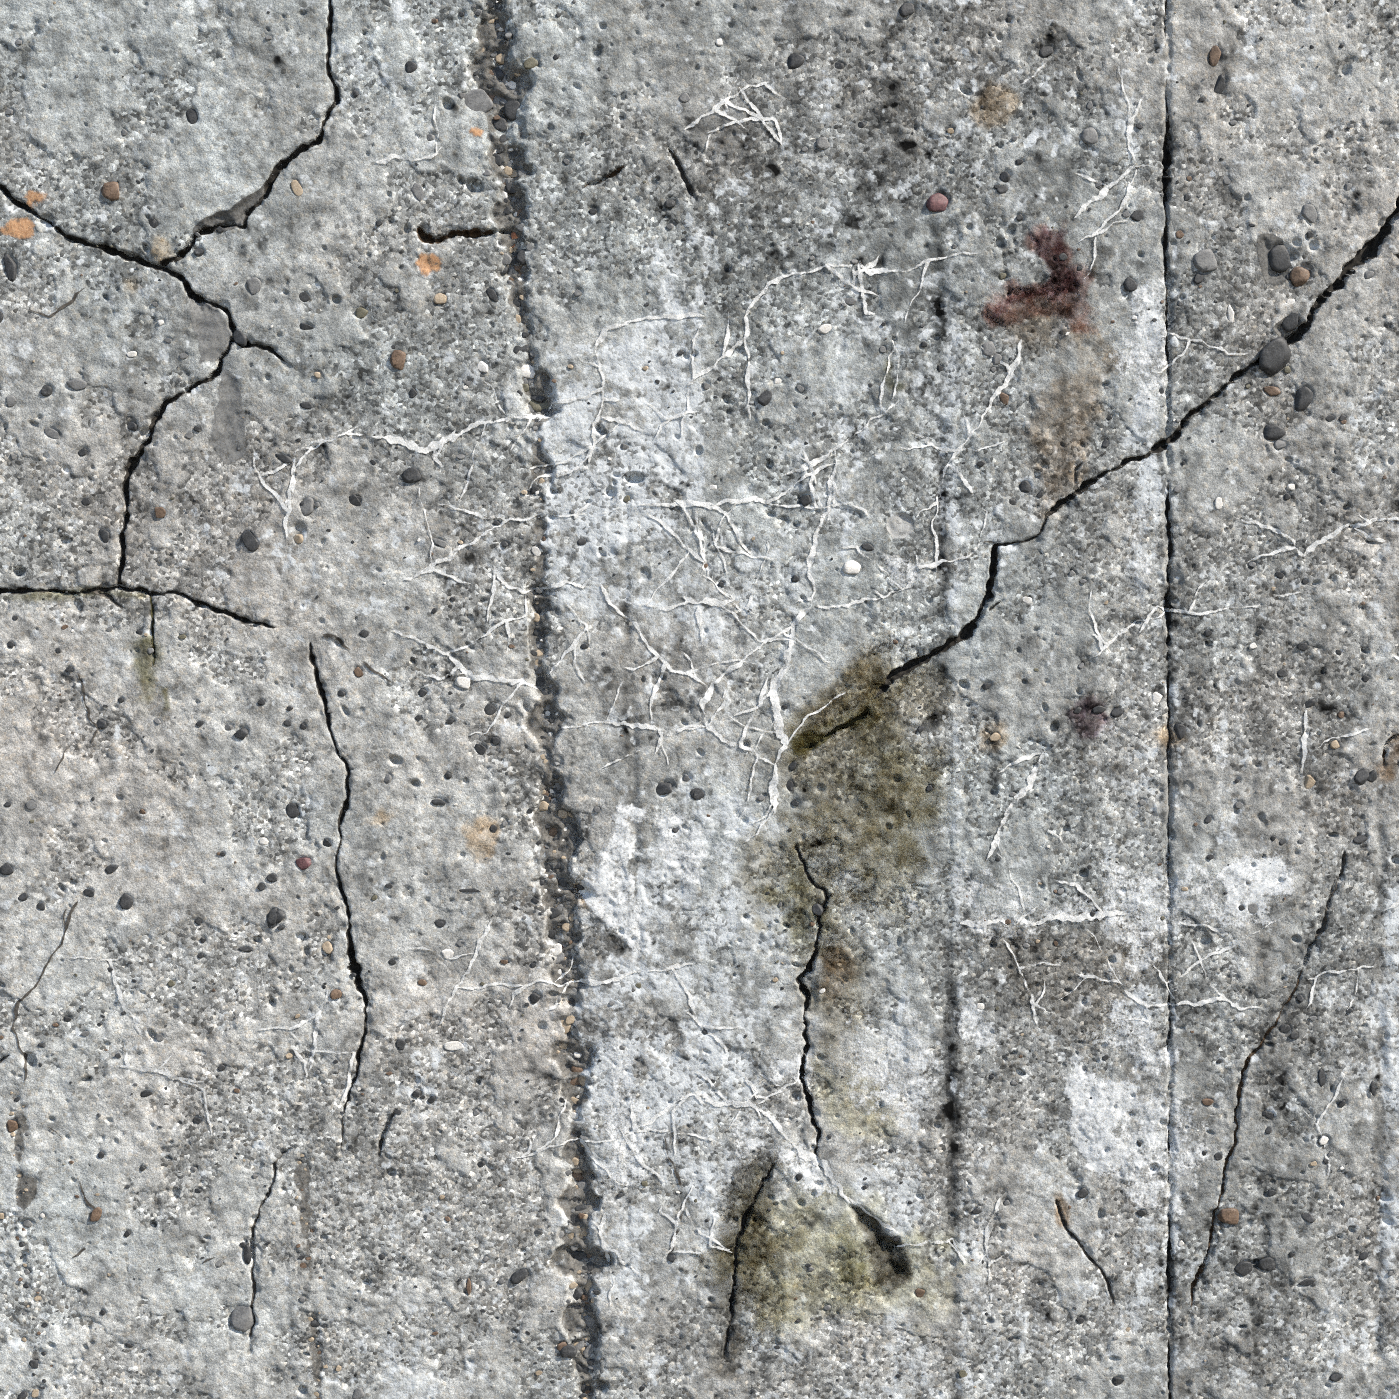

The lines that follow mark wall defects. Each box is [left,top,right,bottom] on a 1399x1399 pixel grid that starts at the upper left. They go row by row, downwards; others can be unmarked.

crack [0,0,339,665]
efflorescence [1109,271,1168,423]
damp [883,554,929,587]
crack [799,196,1399,749]
damp [1131,502,1152,589]
crack [309,633,391,1150]
crack [0,901,78,1084]
damp [731,1115,837,1197]
damp [767,1050,812,1084]
crack [796,844,827,1158]
crack [1191,851,1346,1308]
crack [724,1163,775,1355]